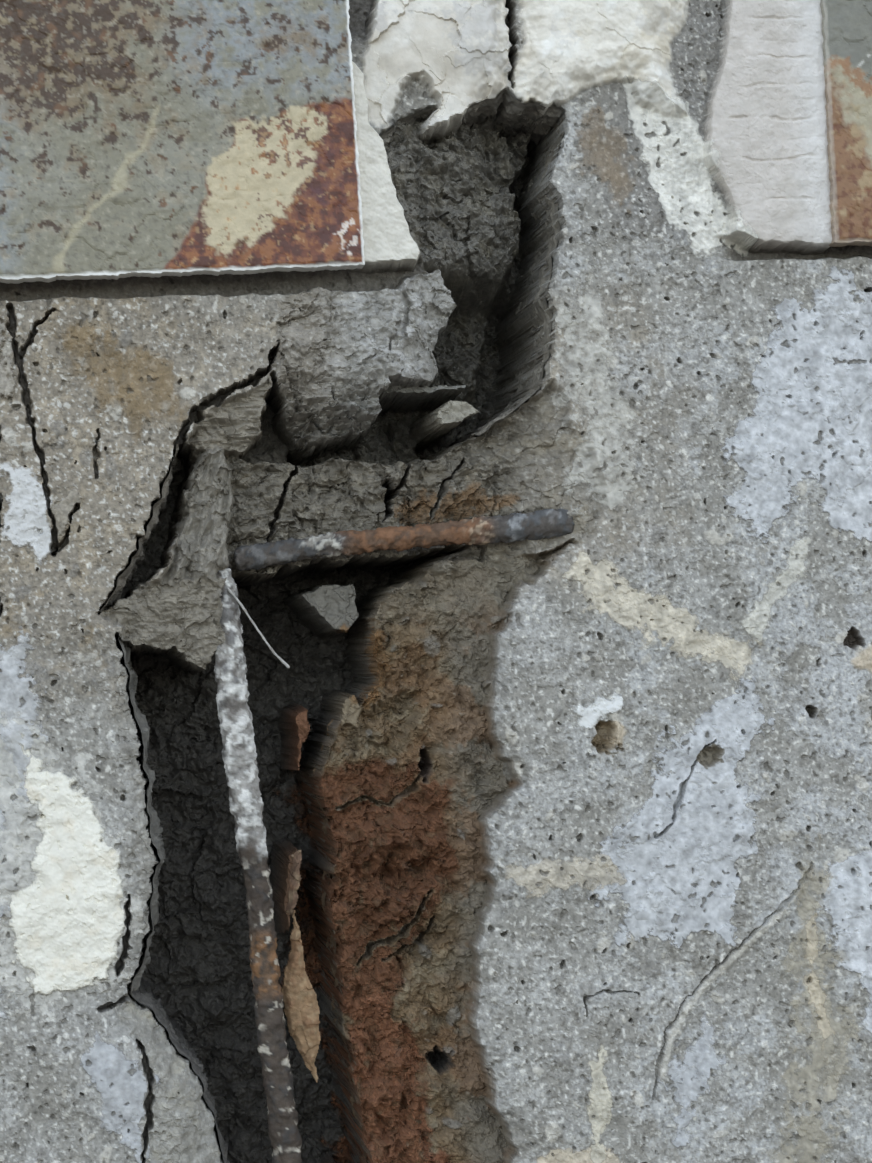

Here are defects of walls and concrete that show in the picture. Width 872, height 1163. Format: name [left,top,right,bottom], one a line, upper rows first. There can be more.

crack [505,0,520,90]
crack [5,303,102,558]
spalling [0,90,607,1163]
corrosion [277,760,459,1163]
crack [652,862,814,1103]